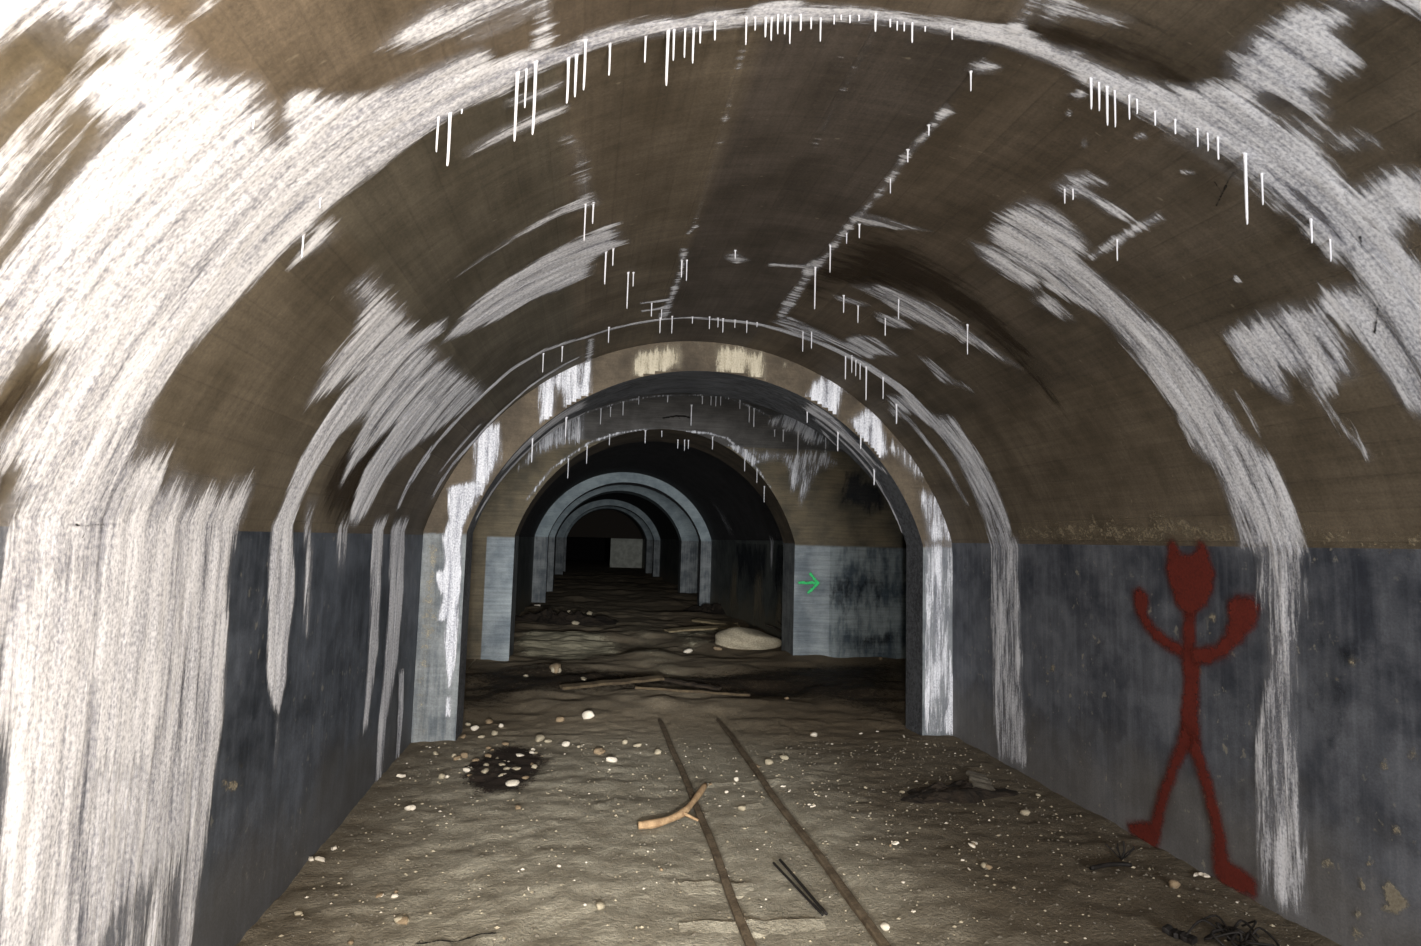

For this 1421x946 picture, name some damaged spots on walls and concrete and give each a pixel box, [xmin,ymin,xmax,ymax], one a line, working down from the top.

leakage [0,0,336,946]
leakage [267,108,1054,781]
leakage [284,0,1421,412]
leakage [977,175,1304,907]